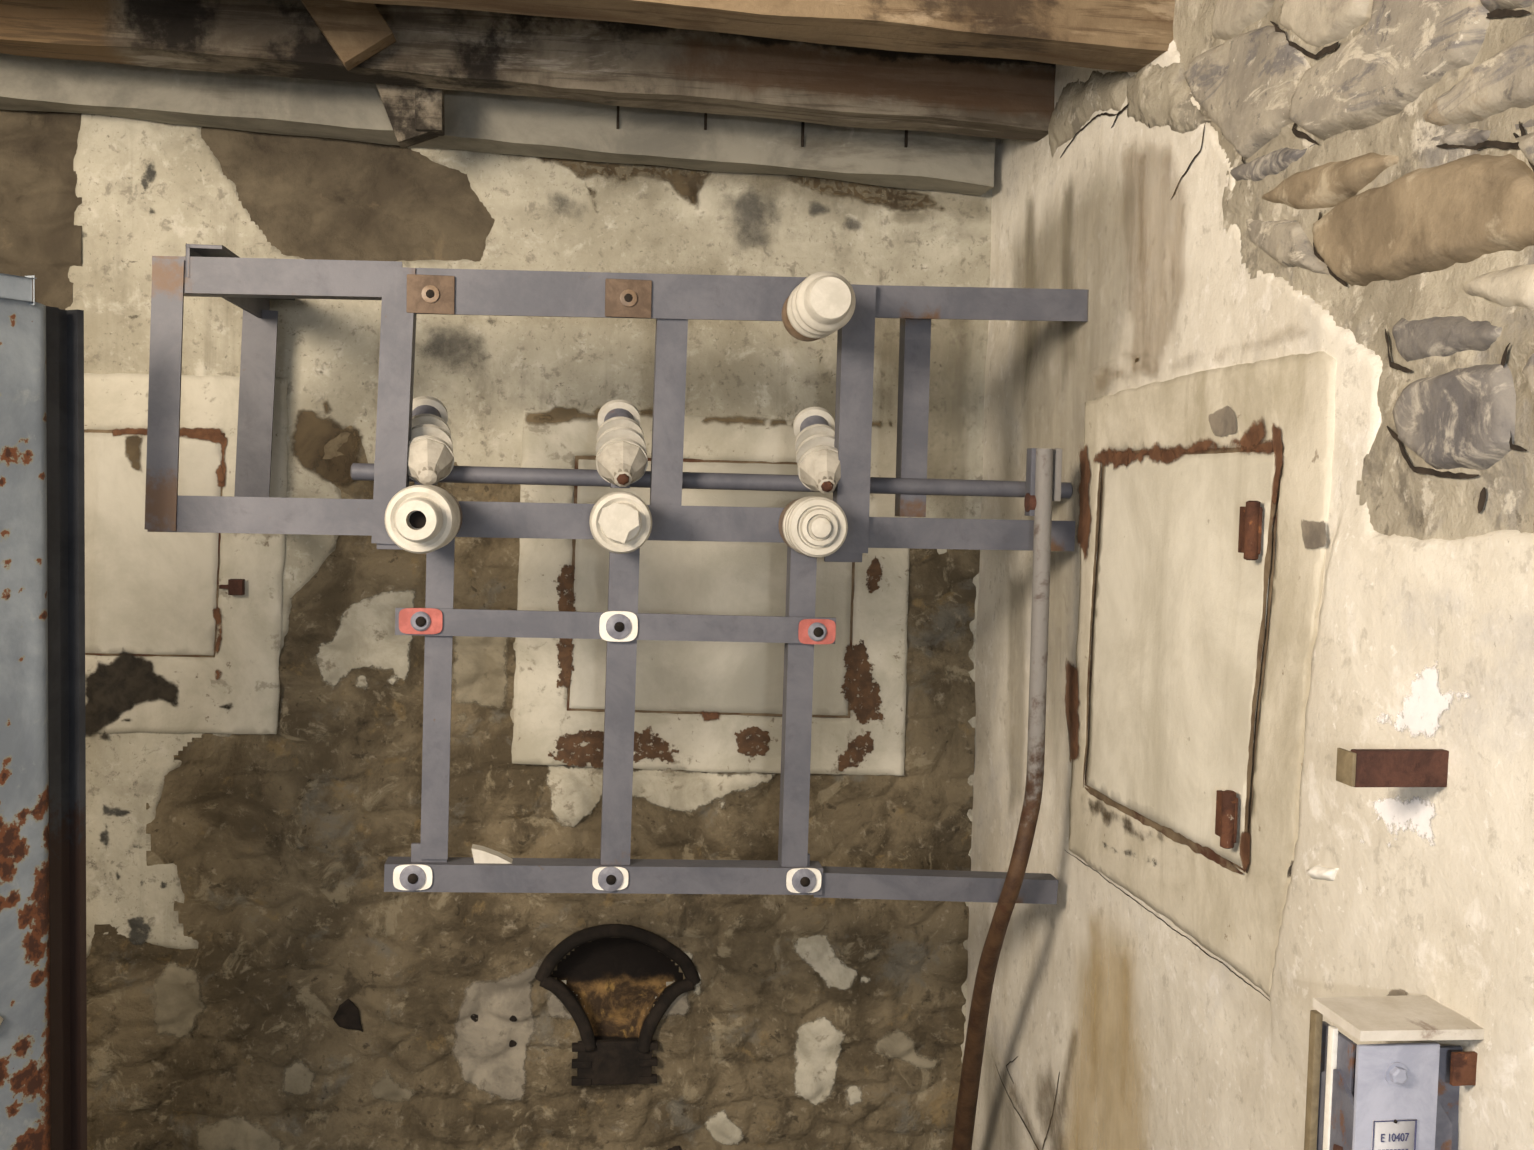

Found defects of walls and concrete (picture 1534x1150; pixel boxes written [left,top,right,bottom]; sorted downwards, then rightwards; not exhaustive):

spalling [201,126,495,262]
spalling [1048,0,1534,540]
spalling [323,420,374,499]
spalling [433,462,521,502]
rust [1077,419,1283,559]
rust [556,564,576,612]
rust [556,638,574,688]
rust [548,728,604,769]
rust [633,726,679,765]
rust [734,726,772,760]
rust [837,640,885,772]
spalling [86,535,980,1150]